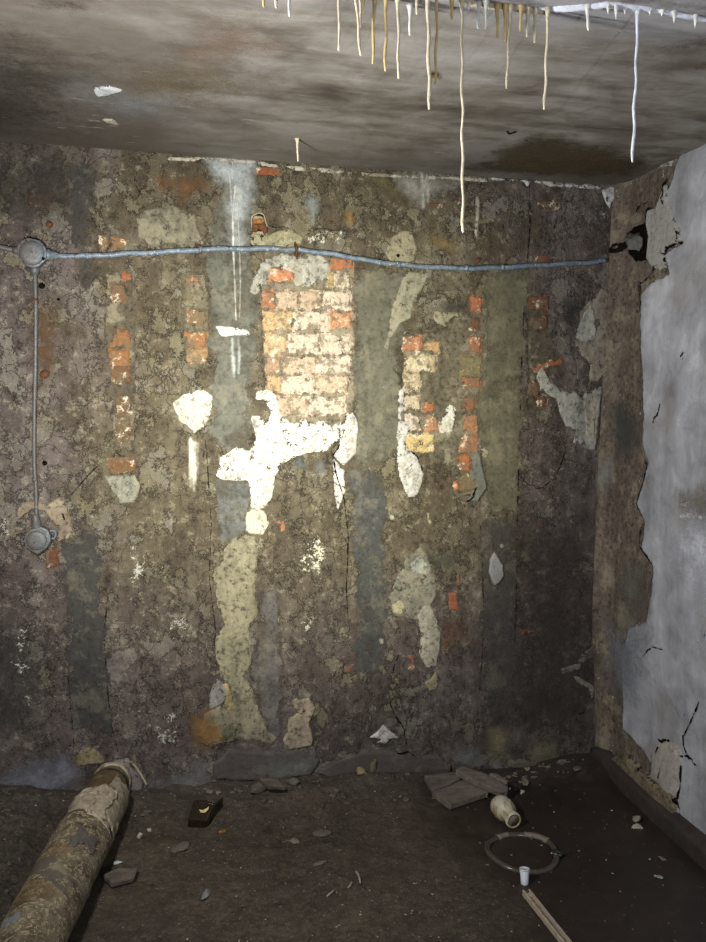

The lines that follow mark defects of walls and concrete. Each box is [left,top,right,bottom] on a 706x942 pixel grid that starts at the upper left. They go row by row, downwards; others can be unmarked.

water stain [458,0,706,23]
water stain [168,138,642,284]
flaking render [173,389,213,433]
spalling [180,273,250,370]
water stain [231,338,240,377]
spalling [384,231,489,502]
spalling [200,229,358,750]
spalling [526,157,684,813]
flaking render [389,547,460,691]
flaking render [488,544,505,585]
flaking render [370,725,398,744]
crack [650,702,699,814]